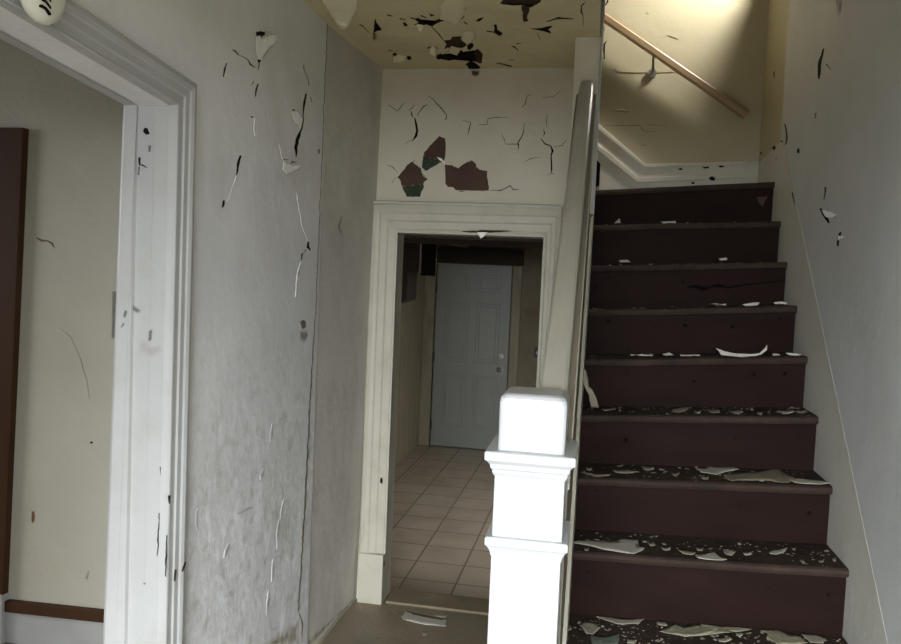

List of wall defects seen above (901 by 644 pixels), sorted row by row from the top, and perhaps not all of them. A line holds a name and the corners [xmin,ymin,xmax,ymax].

peeling [256,31,279,70]
peeling [322,0,382,38]
flaking render [387,0,483,69]
flaking render [500,0,541,22]
crack [388,90,566,175]
peeling [388,136,489,197]
peeling [820,187,837,223]